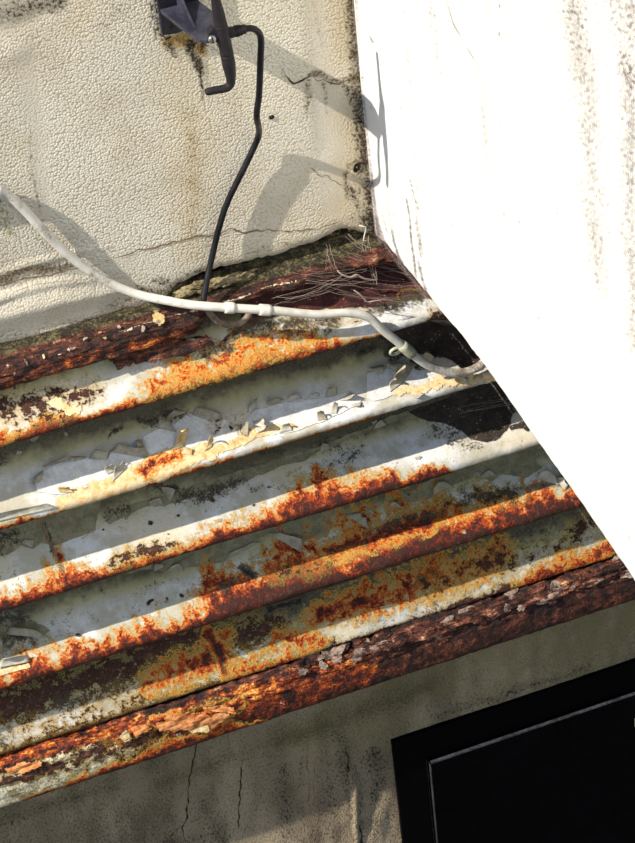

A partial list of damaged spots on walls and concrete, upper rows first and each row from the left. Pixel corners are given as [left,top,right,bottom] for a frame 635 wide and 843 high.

crack [264,54,357,85]
water stain [305,0,431,321]
water stain [0,263,73,282]
corrosion [0,260,432,447]
water stain [195,316,341,363]
corrosion [0,406,408,530]
peeling [0,316,530,556]
peeling [389,444,571,508]
corrosion [0,462,617,801]
peeling [293,628,417,676]
crack [170,744,197,842]
crack [236,760,244,829]